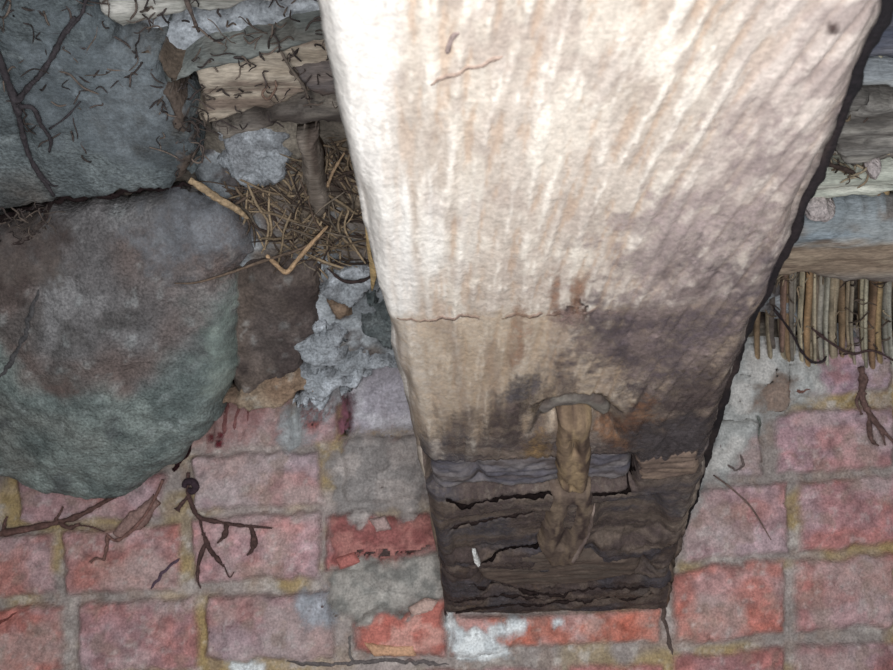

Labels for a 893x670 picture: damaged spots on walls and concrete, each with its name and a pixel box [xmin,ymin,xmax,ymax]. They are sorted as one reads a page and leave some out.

leakage [397,314,480,327]
leakage [420,192,790,661]
crack [446,491,552,530]
spalling [330,512,435,569]
spalling [359,598,445,656]
crack [443,542,673,655]